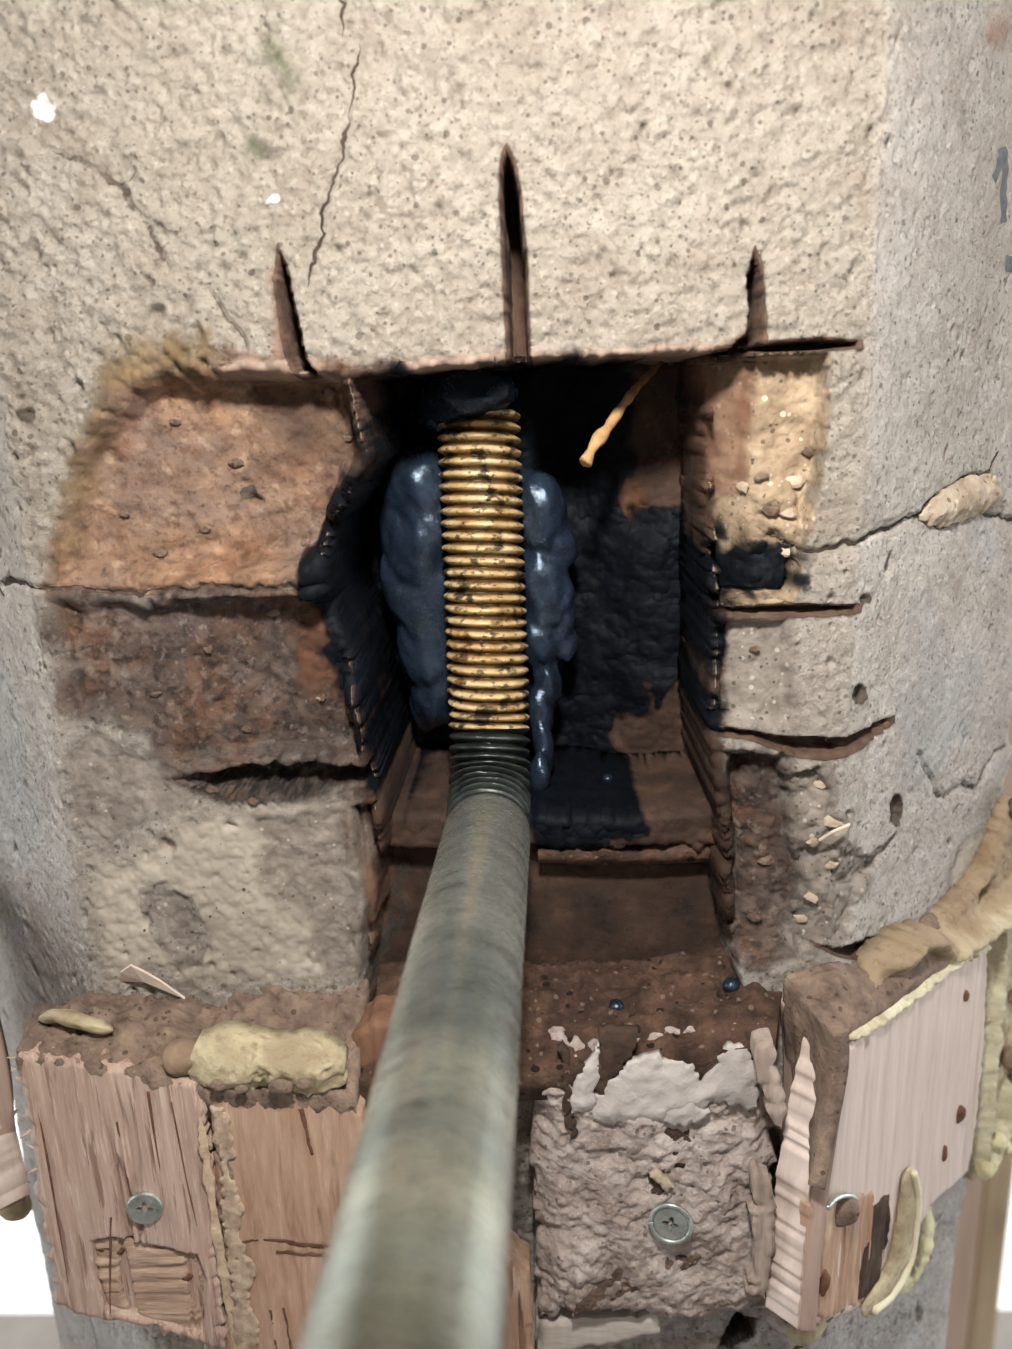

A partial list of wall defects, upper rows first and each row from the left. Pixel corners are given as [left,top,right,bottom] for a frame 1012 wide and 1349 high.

crack [53,151,169,267]
crack [308,0,361,287]
crack [212,294,247,349]
crack [0,576,294,597]
spalling [685,351,831,729]
crack [744,451,1012,567]
spalling [43,349,376,999]
spalling [852,683,868,704]
spalling [727,752,875,969]
peeling [557,1022,761,1195]